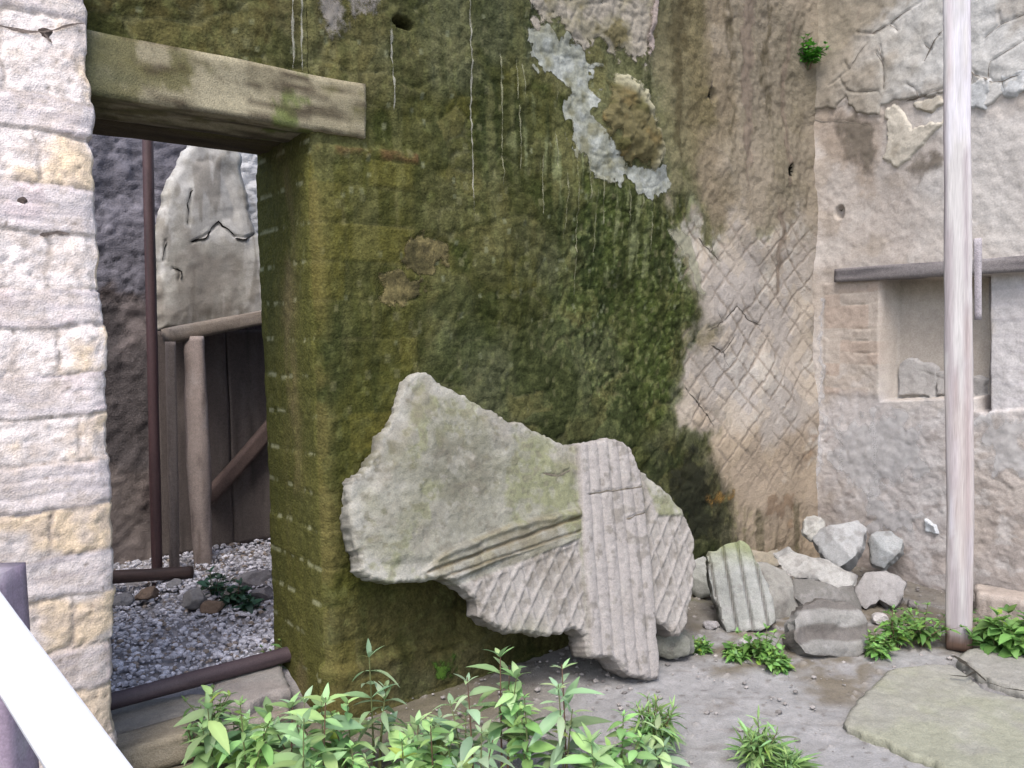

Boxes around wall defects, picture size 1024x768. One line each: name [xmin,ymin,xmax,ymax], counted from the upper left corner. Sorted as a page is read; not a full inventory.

crack [0,23,84,43]
flaking render [530,0,659,67]
crack [845,12,941,101]
crack [971,15,1023,91]